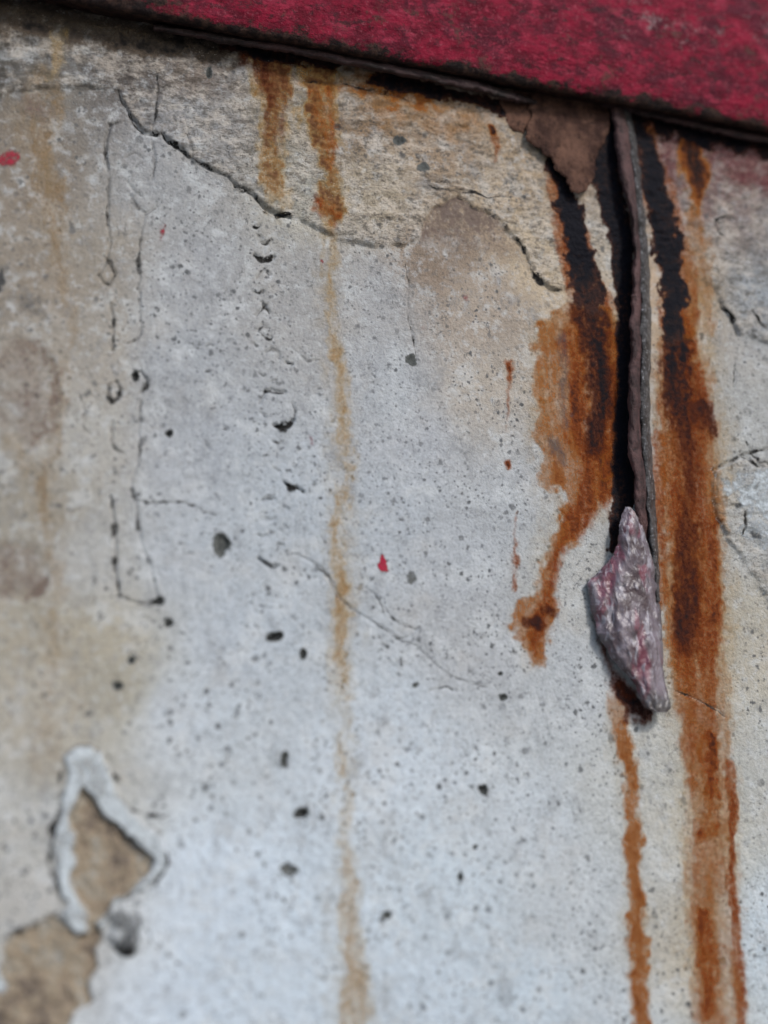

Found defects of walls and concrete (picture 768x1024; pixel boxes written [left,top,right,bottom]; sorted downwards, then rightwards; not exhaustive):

crack [118,75,291,218]
rust [241,54,442,227]
crack [429,180,499,198]
peeling [420,196,544,286]
rust [677,139,711,245]
rust [508,302,619,664]
peeling [499,90,671,712]
rust [653,324,747,1024]
spalling [0,745,170,1024]
rust [597,638,653,1024]